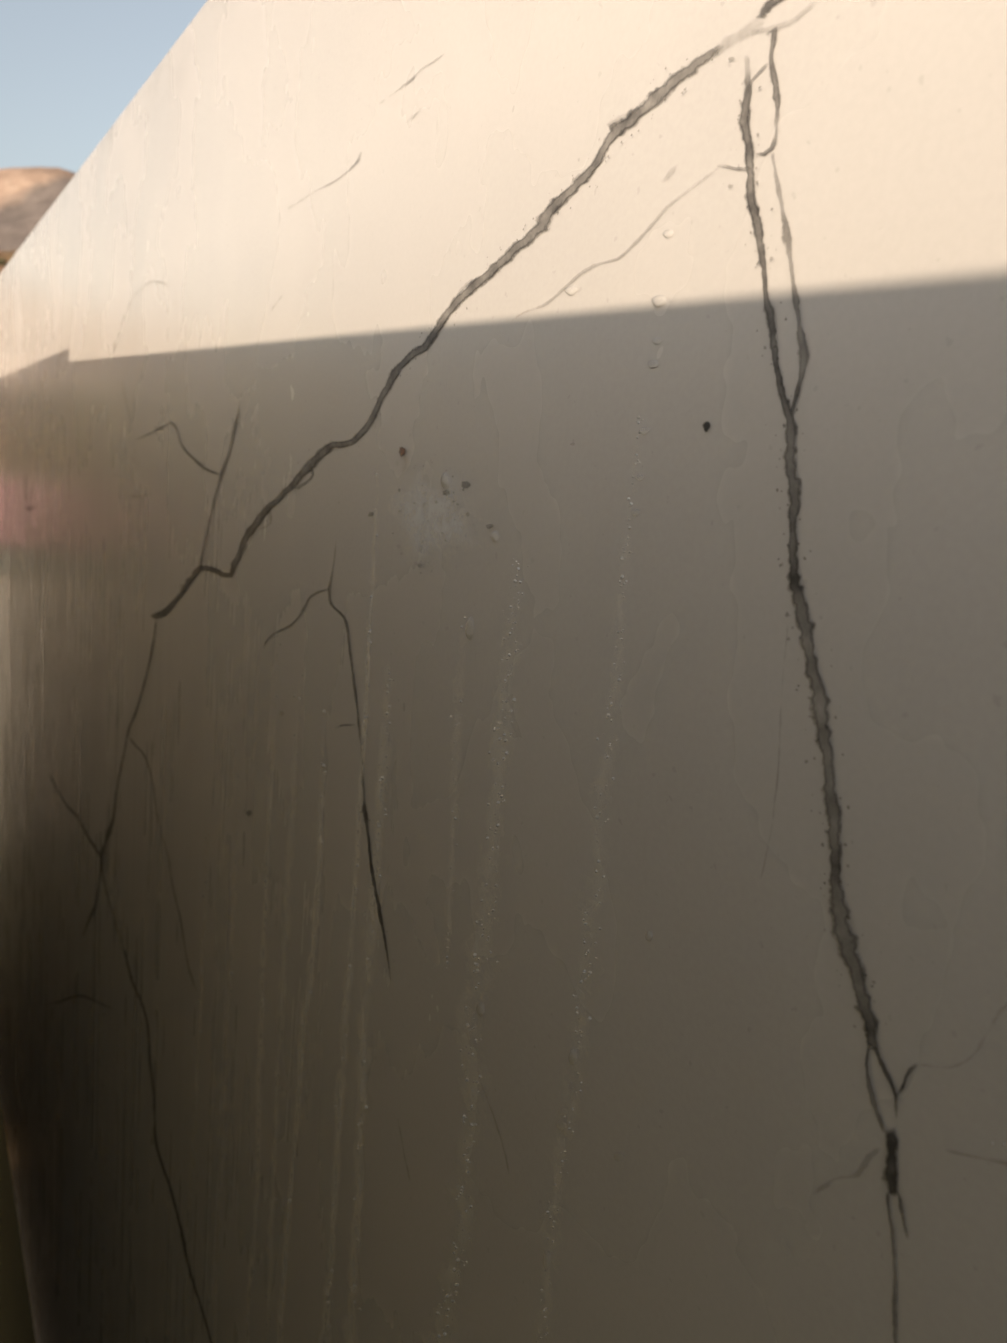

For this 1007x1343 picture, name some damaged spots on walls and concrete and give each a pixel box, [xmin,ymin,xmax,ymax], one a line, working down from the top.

crack [50,47,719,1343]
crack [726,0,915,1343]